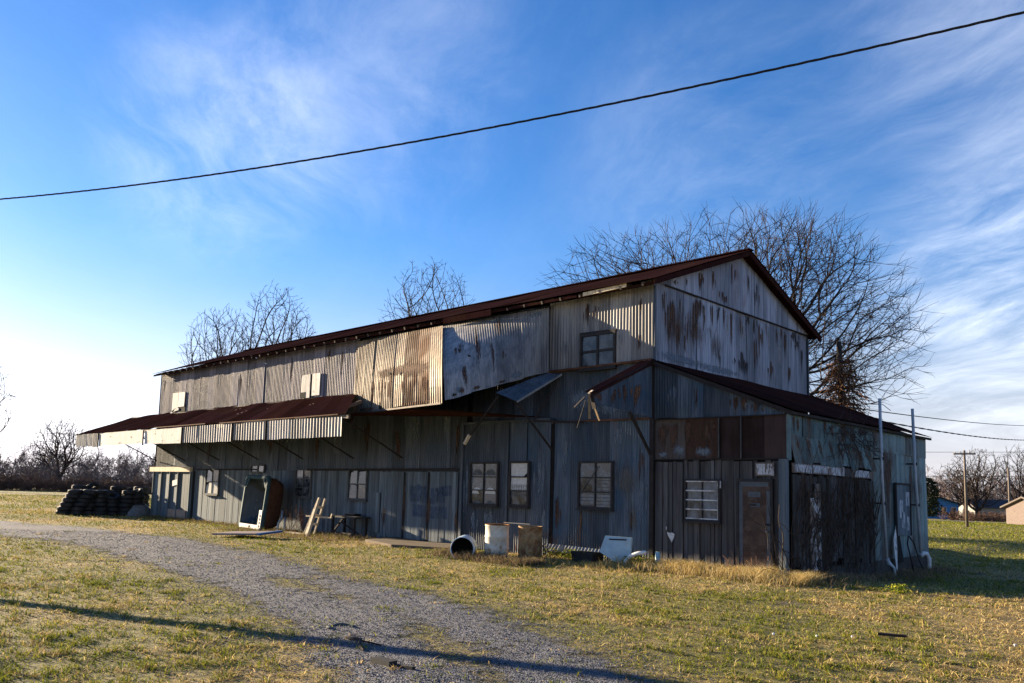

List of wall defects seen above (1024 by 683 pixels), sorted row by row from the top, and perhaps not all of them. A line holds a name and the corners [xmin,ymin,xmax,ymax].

corrosion [454,320,506,370]
corrosion [662,265,803,381]